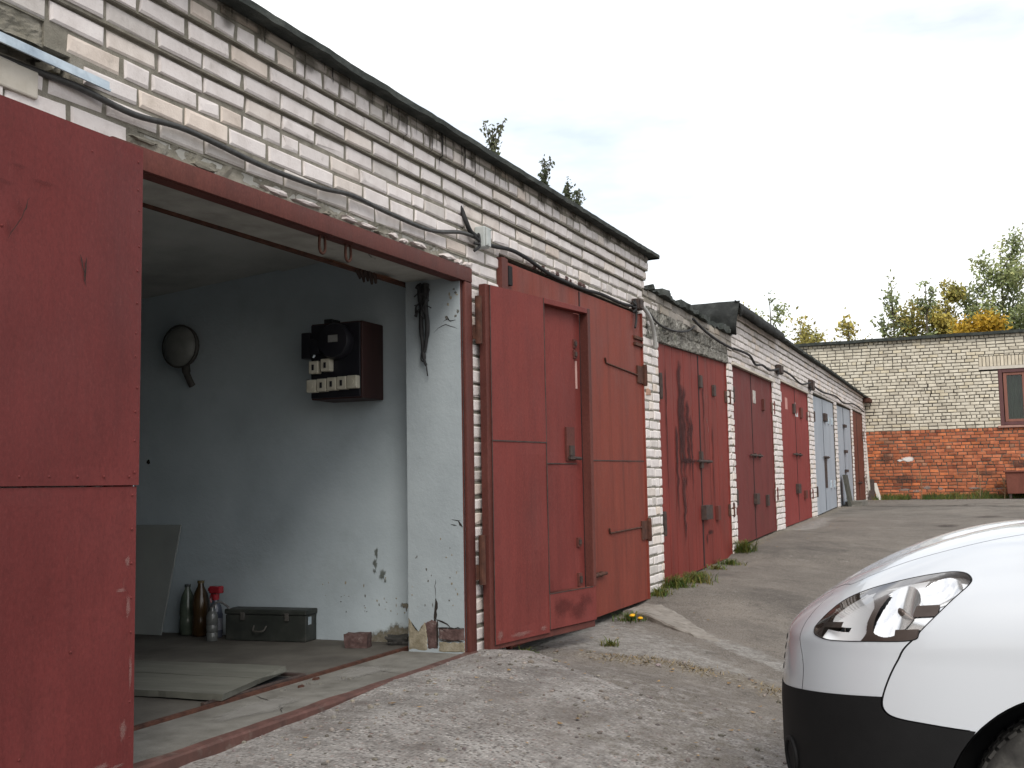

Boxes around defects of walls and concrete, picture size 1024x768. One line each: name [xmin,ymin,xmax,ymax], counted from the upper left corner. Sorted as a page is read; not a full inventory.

flaking render [363,584,465,652]